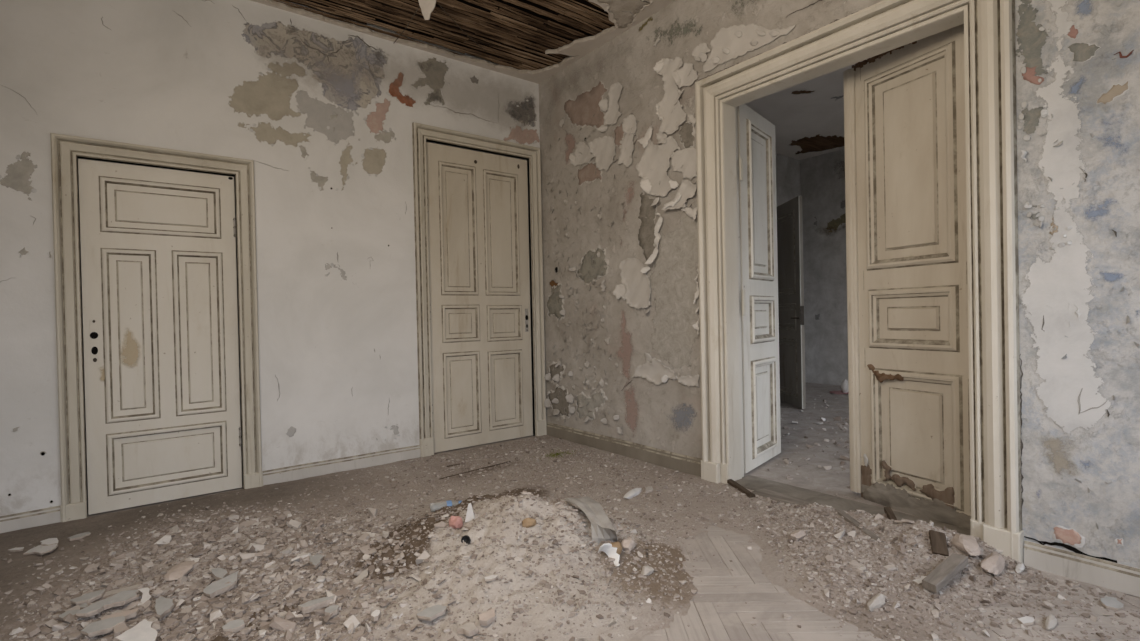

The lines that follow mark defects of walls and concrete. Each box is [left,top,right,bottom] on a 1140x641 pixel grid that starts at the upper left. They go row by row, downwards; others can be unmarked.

peeling [0,152,37,200]
flaking render [228,0,654,191]
peeling [504,23,795,435]
peeling [786,134,844,156]
peeling [814,200,846,230]
peeling [1015,0,1116,435]
leakage [618,313,638,430]
peeling [1052,525,1085,548]